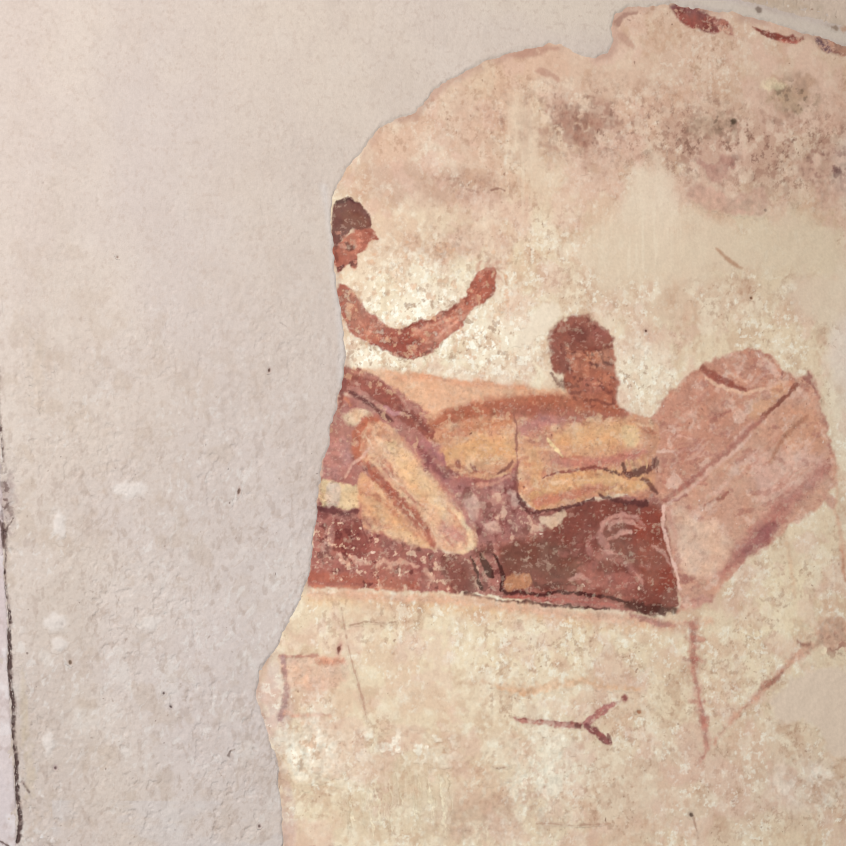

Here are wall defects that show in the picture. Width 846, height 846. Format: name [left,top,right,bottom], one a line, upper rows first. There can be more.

crack [0,365,8,465]
crack [0,516,25,846]